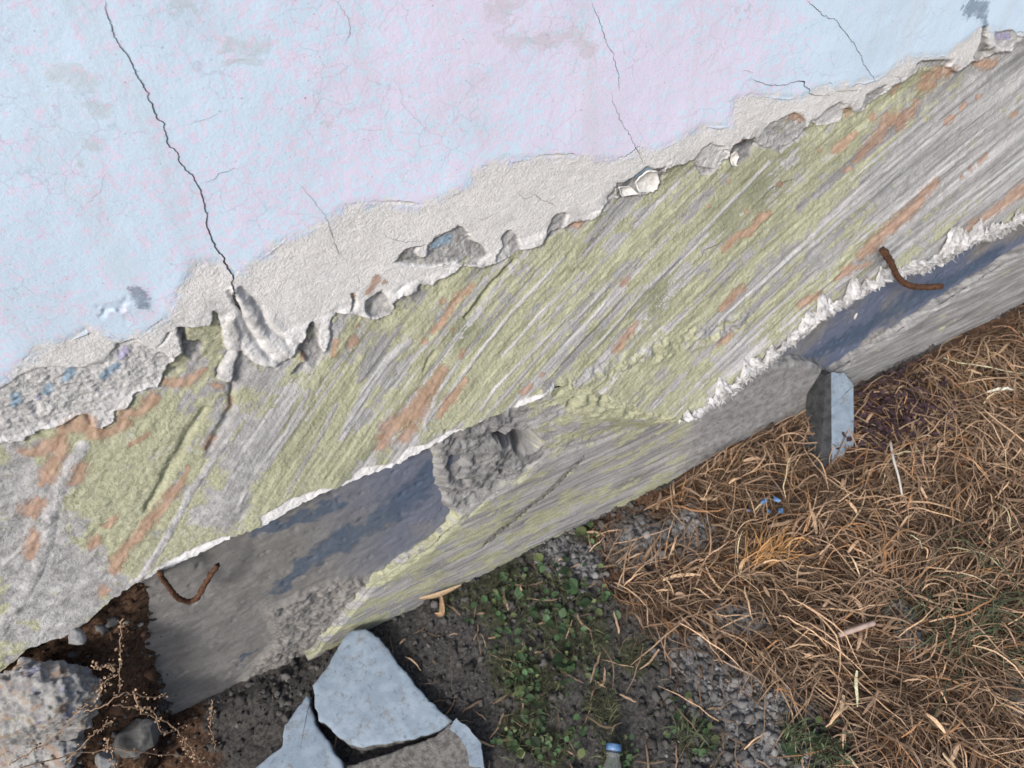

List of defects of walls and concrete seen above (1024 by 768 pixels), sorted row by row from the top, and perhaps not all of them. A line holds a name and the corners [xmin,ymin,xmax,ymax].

crack [745,1,902,96]
spalling [0,327,205,442]
leakage [128,287,150,309]
crack [105,1,241,325]
spalling [291,321,322,375]
spalling [393,225,523,267]
flaking render [615,166,667,198]
spalling [693,102,847,177]
leakage [678,209,1024,423]
corrosion [833,178,940,281]
spalling [879,246,944,291]
spalling [259,382,557,527]